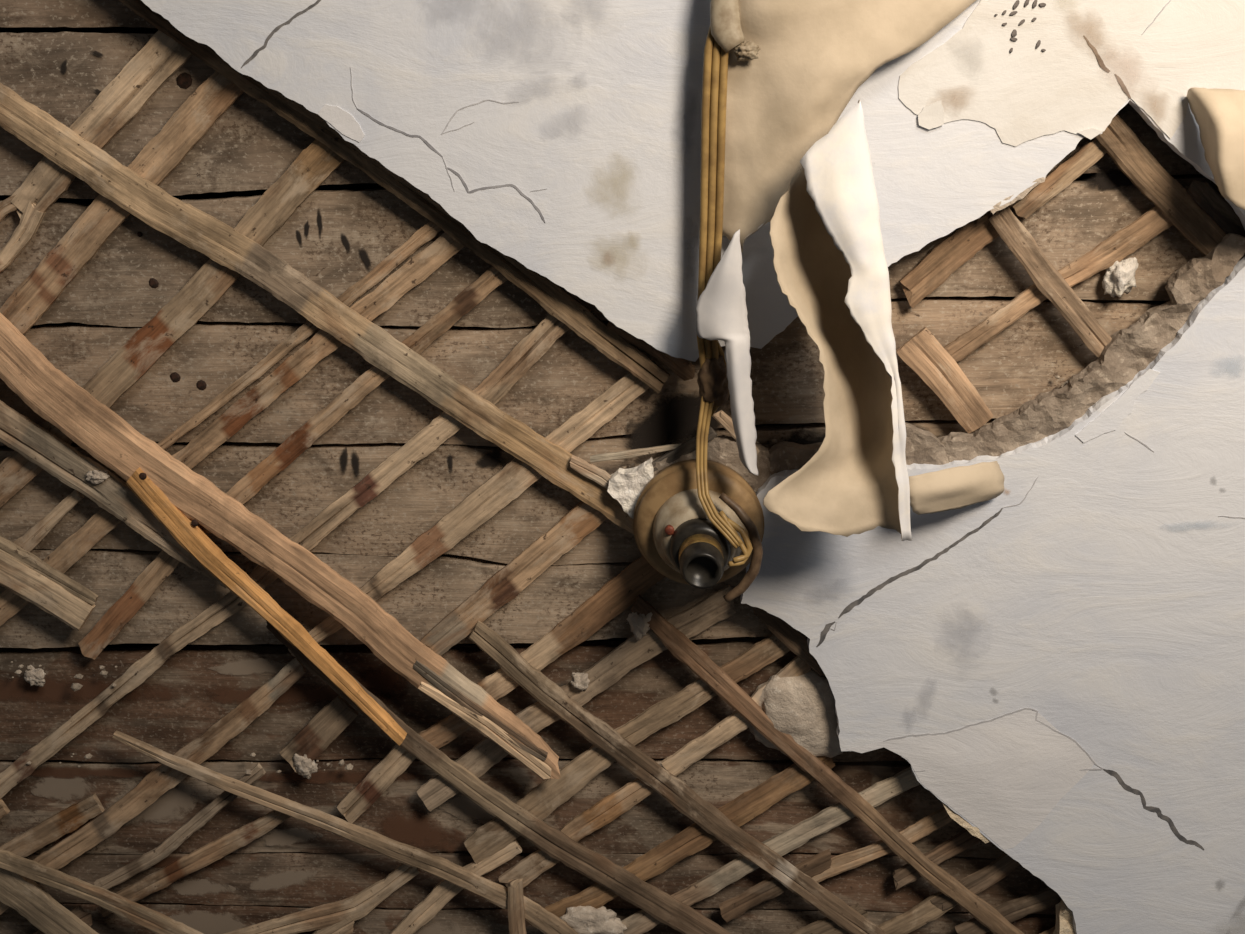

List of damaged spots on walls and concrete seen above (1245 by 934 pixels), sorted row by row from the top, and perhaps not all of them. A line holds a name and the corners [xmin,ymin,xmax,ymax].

crack [241,0,321,68]
peeling [318,104,365,142]
crack [350,67,545,222]
spalling [607,435,822,519]
crack [816,476,1039,647]
crack [883,708,1204,850]
spalling [942,802,991,843]
spalling [1053,900,1075,934]